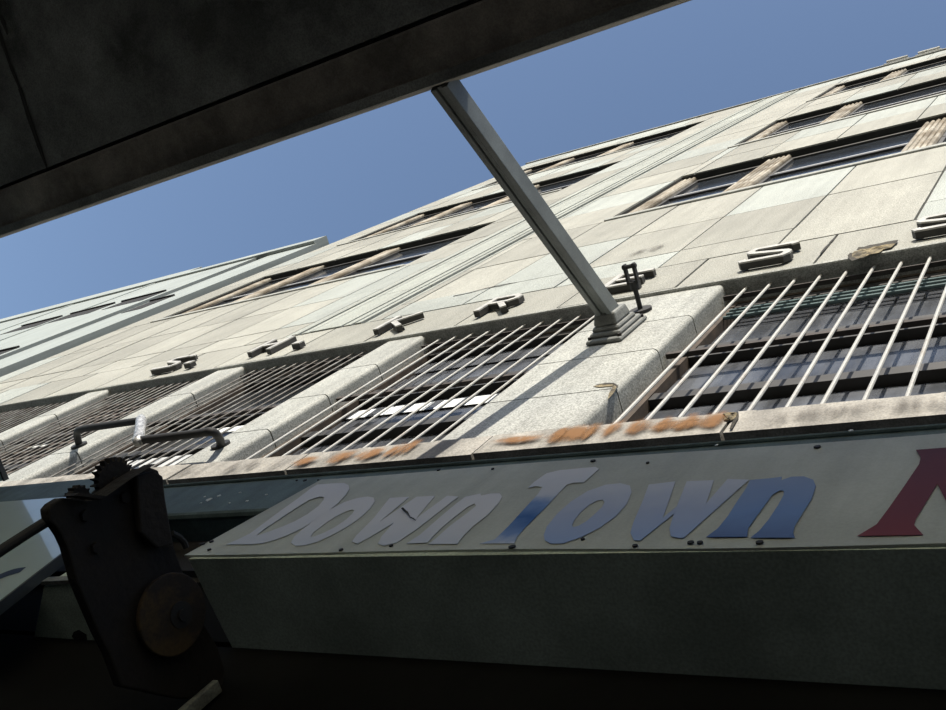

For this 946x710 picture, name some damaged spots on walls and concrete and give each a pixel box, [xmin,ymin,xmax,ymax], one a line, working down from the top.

rust [498,412,725,442]
rust [329,441,420,462]